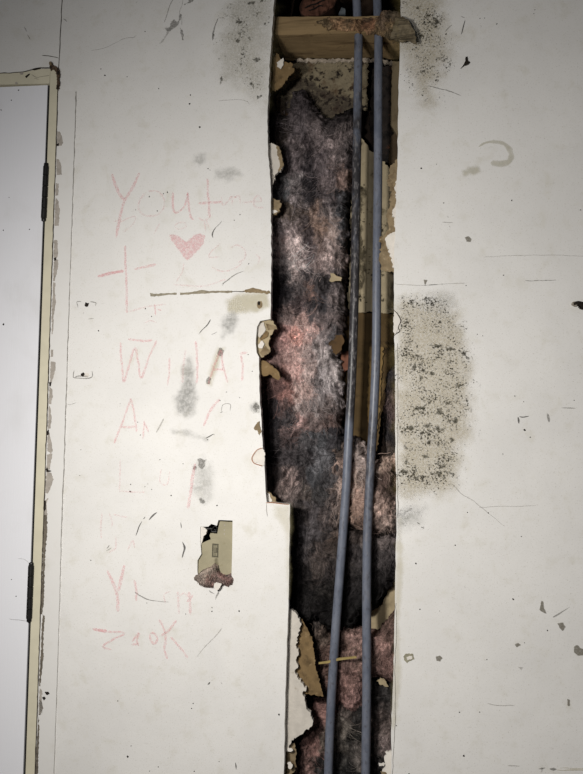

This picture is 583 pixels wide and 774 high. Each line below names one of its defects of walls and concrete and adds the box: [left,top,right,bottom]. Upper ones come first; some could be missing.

spalling [275,0,285,17]
spalling [382,0,401,12]
leakage [409,0,451,85]
spalling [269,90,277,116]
spalling [361,59,400,152]
spalling [385,180,397,268]
peeling [258,322,277,356]
peeling [389,309,401,334]
leakage [390,297,474,492]
peeling [251,448,265,466]
spalling [375,397,386,460]
spalling [286,608,319,752]